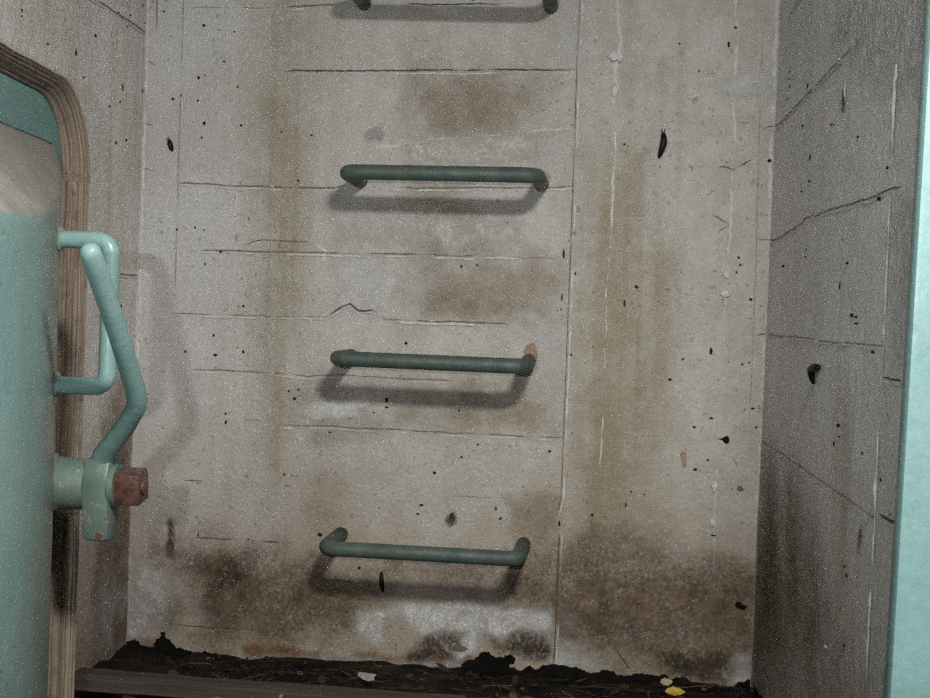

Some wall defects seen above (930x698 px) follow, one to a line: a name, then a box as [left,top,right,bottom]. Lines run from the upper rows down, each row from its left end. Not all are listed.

water stain [96,506,797,698]